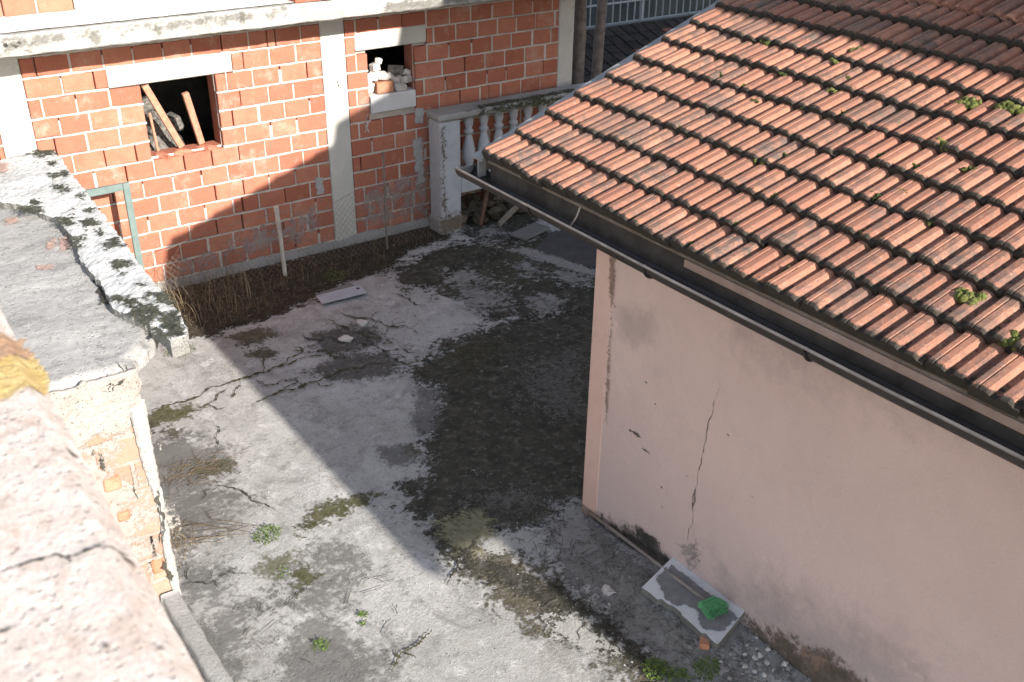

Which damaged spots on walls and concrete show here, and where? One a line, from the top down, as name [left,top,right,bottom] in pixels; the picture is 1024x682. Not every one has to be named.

spalling [102,474,122,493]
crack [677,389,719,558]
spalling [117,509,131,522]
crack [1,545,129,573]
water stain [473,495,749,682]
water stain [740,620,867,682]